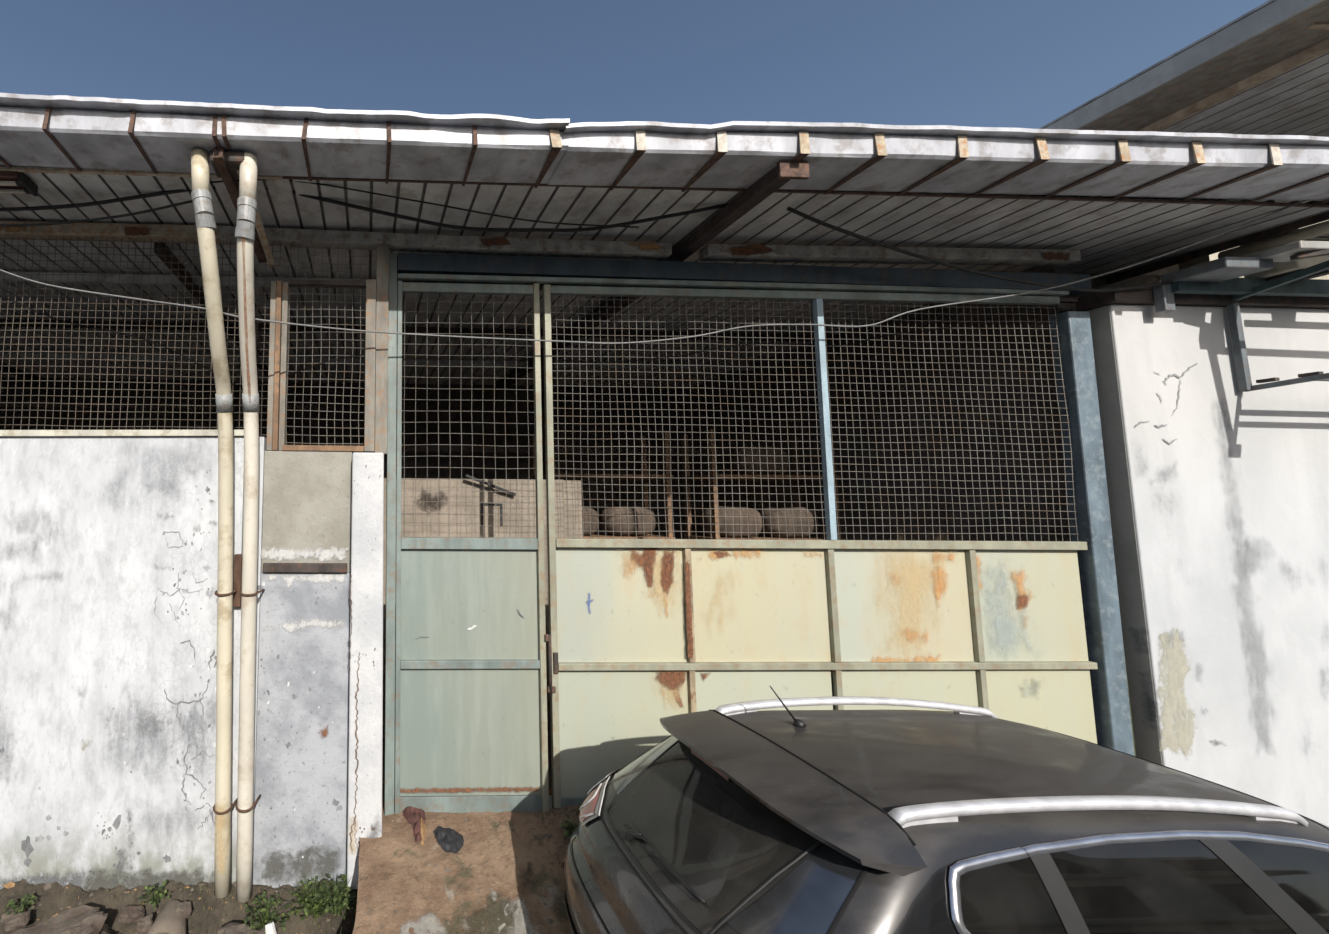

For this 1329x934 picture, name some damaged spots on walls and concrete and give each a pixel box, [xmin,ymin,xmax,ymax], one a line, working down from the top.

crack [1135,363,1197,445]
peeling [257,538,379,590]
crack [164,640,217,837]
peeling [265,618,345,632]
crack [349,574,360,850]
rust [629,548,693,707]
peeling [1147,629,1194,755]
leakage [1245,625,1269,746]
leakage [85,870,214,890]